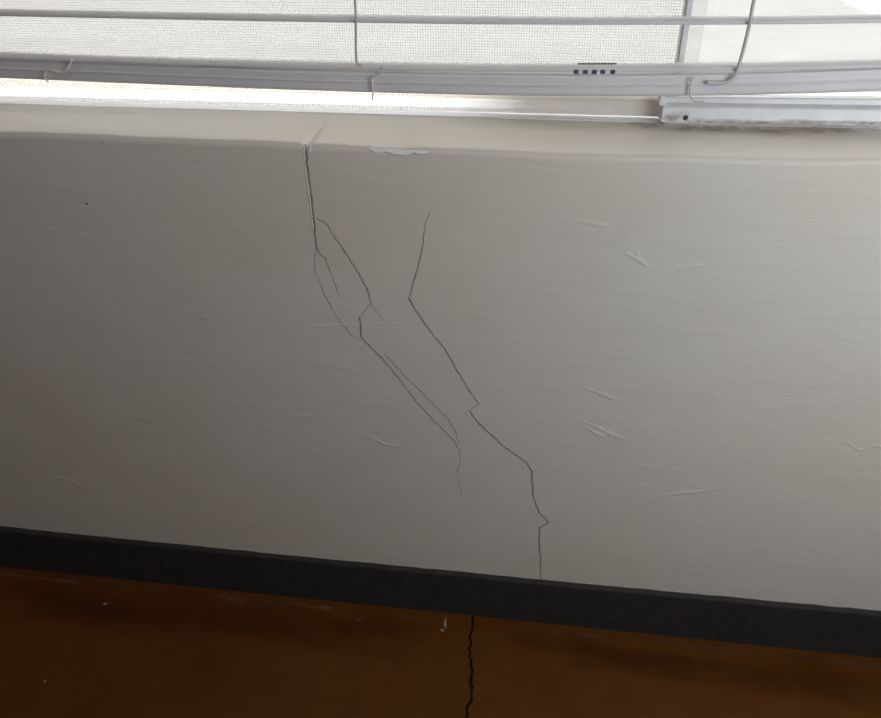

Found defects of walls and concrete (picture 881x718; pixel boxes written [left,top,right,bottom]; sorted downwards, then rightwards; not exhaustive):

crack [303,144,369,295]
crack [359,317,456,444]
crack [408,211,549,565]
crack [465,616,475,718]